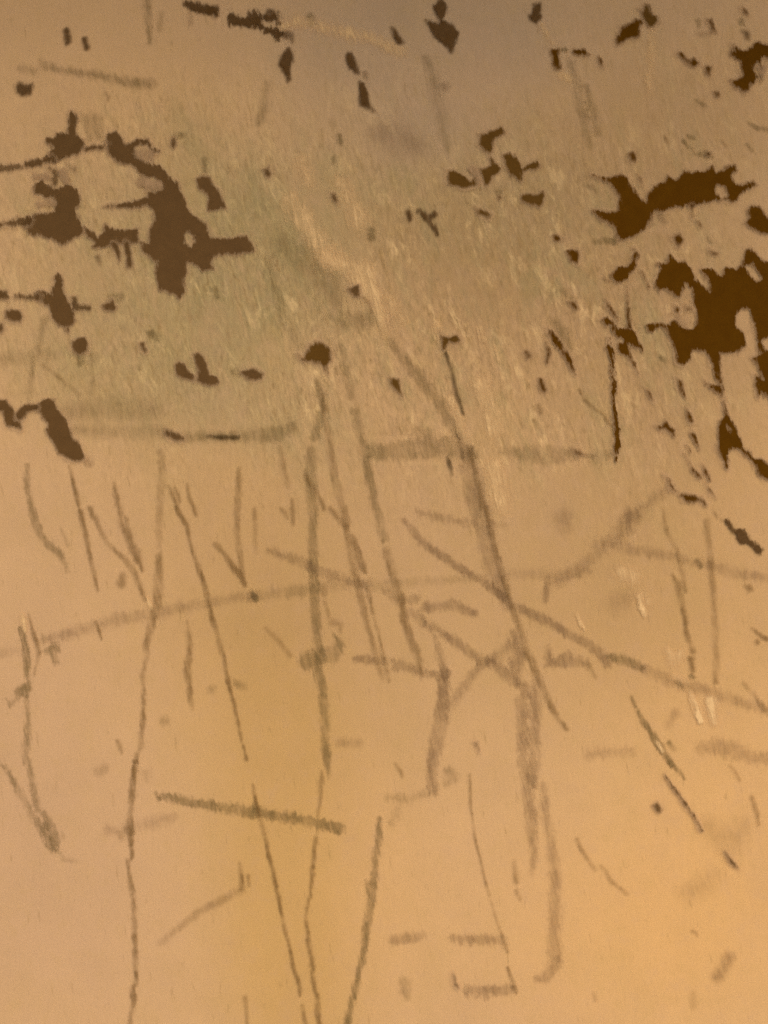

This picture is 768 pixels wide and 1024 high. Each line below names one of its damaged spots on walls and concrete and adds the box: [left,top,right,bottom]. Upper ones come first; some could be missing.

peeling [183,1,293,81]
peeling [428,0,459,52]
peeling [550,48,562,70]
peeling [615,3,659,45]
peeling [729,32,768,93]
peeling [447,126,545,208]
peeling [0,111,255,299]
peeling [591,152,768,496]
peeling [175,352,220,387]
peeling [298,341,332,374]
peeling [0,397,85,462]
peeling [725,519,764,555]